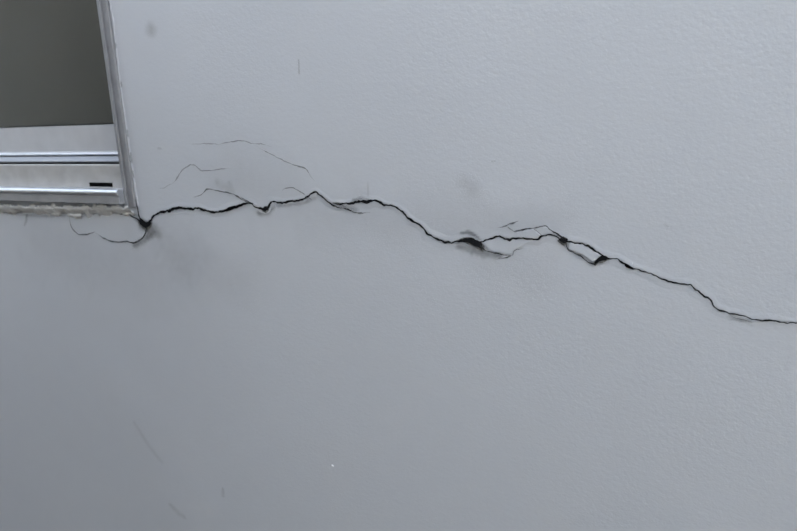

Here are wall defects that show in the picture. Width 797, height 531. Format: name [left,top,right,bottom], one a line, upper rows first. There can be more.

crack [70,140,797,329]